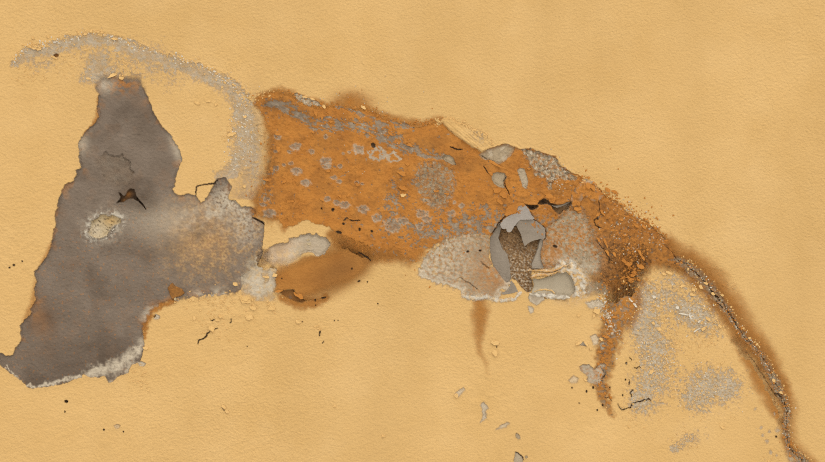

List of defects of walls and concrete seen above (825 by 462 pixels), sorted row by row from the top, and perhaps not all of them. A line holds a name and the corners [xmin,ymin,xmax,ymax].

flaking render [0,73,330,389]
flaking render [414,144,603,313]
rust [243,86,792,419]
crack [671,251,812,462]